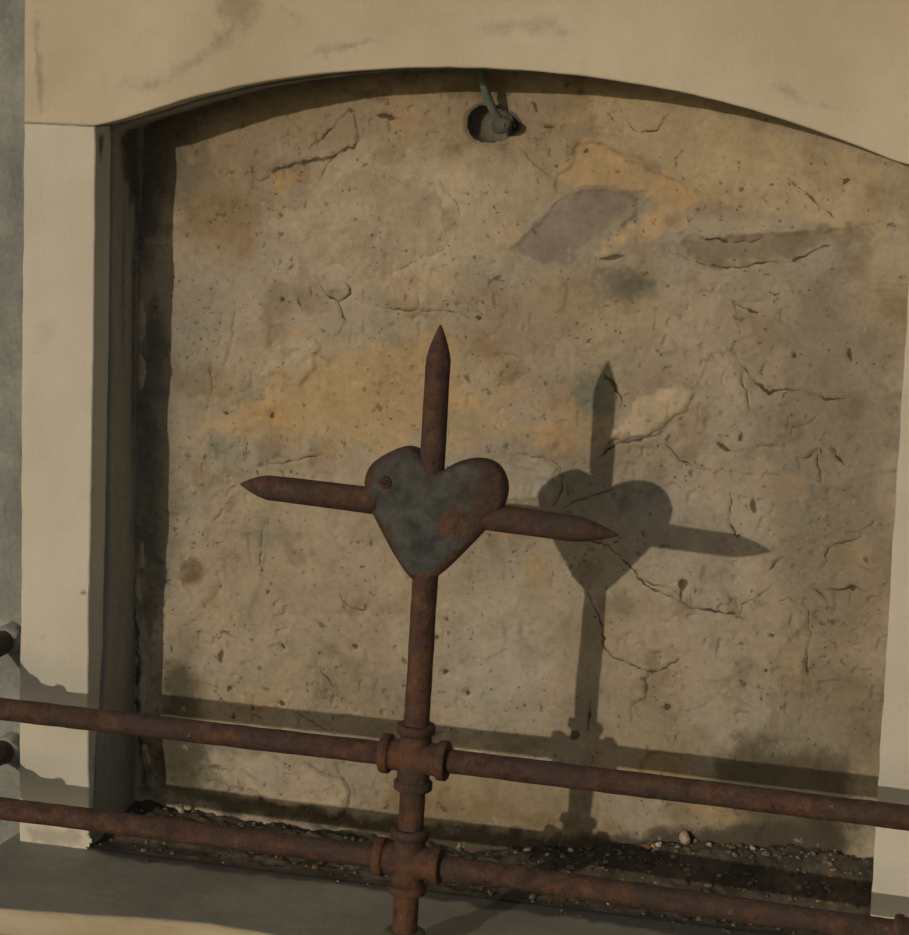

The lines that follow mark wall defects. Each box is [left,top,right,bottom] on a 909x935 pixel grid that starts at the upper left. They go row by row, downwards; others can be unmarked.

crack [247,108,360,182]
water stain [123,89,328,649]
crack [730,300,844,432]
crack [595,367,706,471]
crack [804,444,845,484]
crack [728,492,738,539]
crack [823,521,875,566]
crack [581,581,679,722]
crack [591,541,864,682]
water stain [690,721,871,800]
water stain [188,777,400,841]
water stain [424,776,868,858]